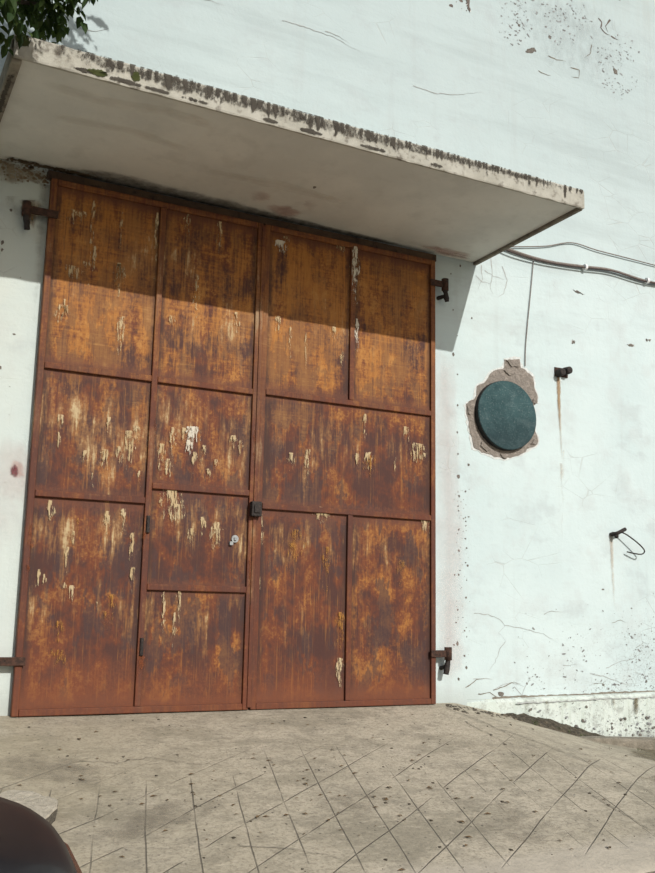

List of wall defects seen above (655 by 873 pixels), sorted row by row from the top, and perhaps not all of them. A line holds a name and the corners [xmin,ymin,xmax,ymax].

crack [465,611,655,704]